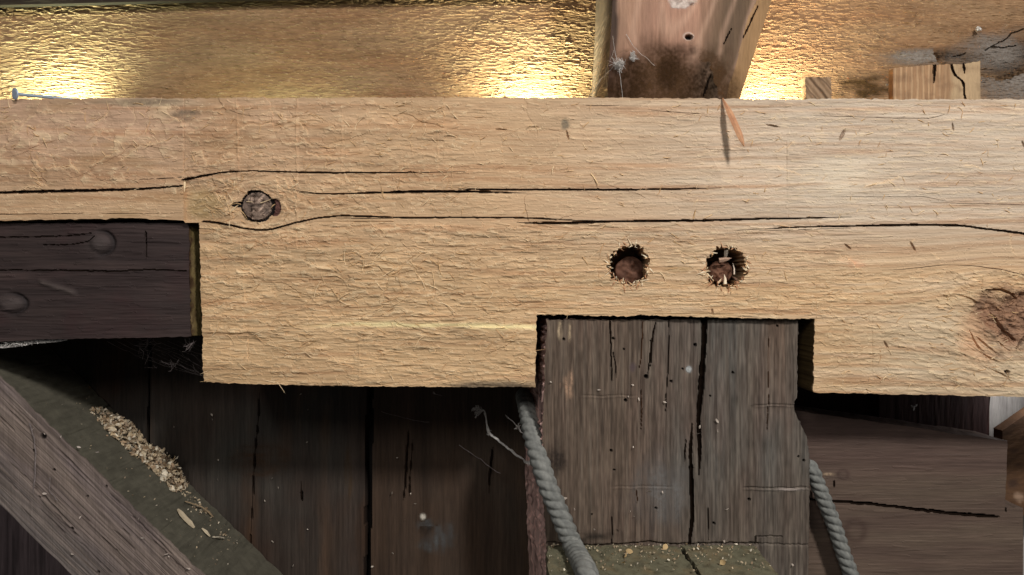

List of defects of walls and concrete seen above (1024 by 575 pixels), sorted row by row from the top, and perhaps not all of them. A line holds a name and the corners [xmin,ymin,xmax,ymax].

crack [0,170,1024,272]
crack [684,317,709,544]
crack [809,480,998,517]